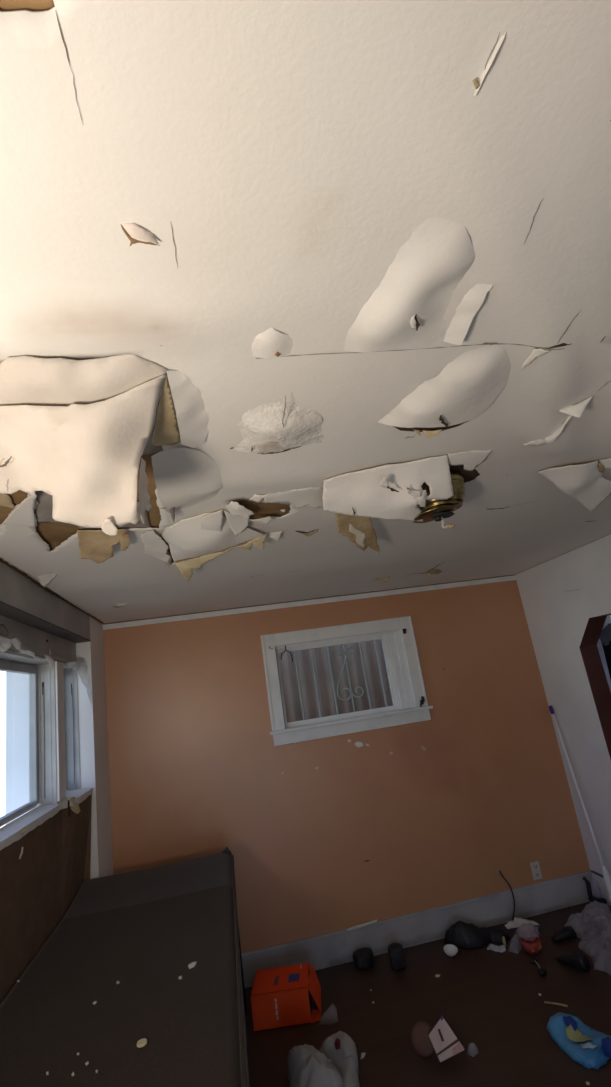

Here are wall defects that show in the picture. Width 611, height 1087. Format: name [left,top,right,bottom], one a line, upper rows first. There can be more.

crack [55,10,83,124]
peeling [448,450,492,483]
peeling [249,487,323,509]
peeling [101,519,118,537]
peeling [141,530,171,568]